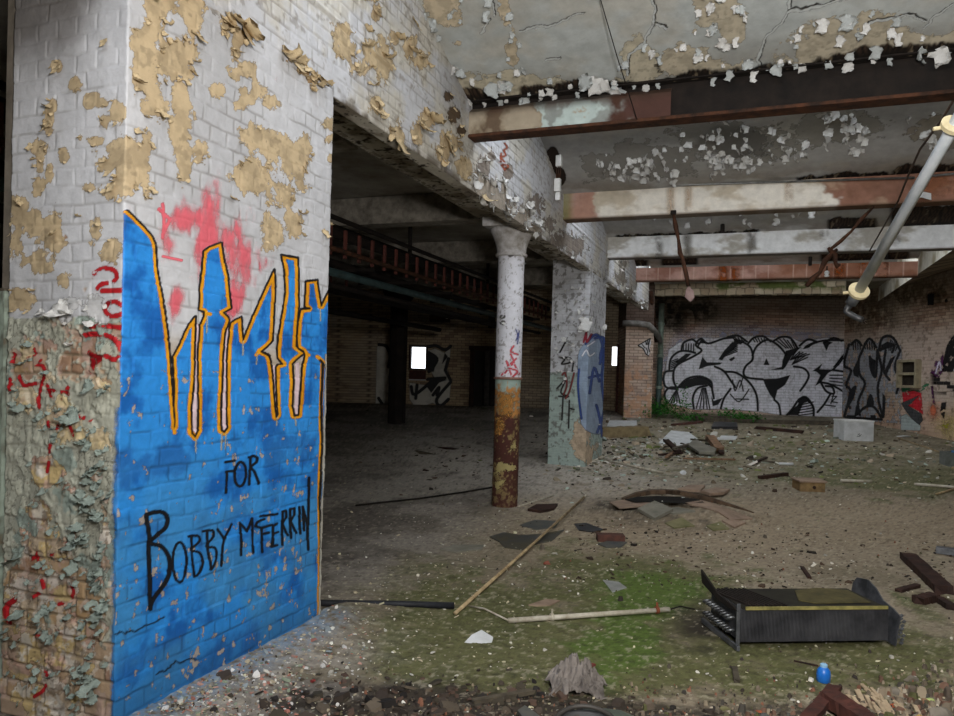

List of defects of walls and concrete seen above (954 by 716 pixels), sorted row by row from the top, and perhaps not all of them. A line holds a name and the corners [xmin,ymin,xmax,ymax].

peeling [282,43,336,92]
crack [626,0,668,76]
crack [756,0,844,66]
crack [867,3,954,30]
peeling [68,0,211,203]
peeling [208,11,316,253]
peeling [330,0,954,259]
corrosion [924,176,948,193]
peeling [74,213,123,265]
peeling [0,98,114,716]
corrosion [495,394,514,436]
corrosion [492,461,516,490]